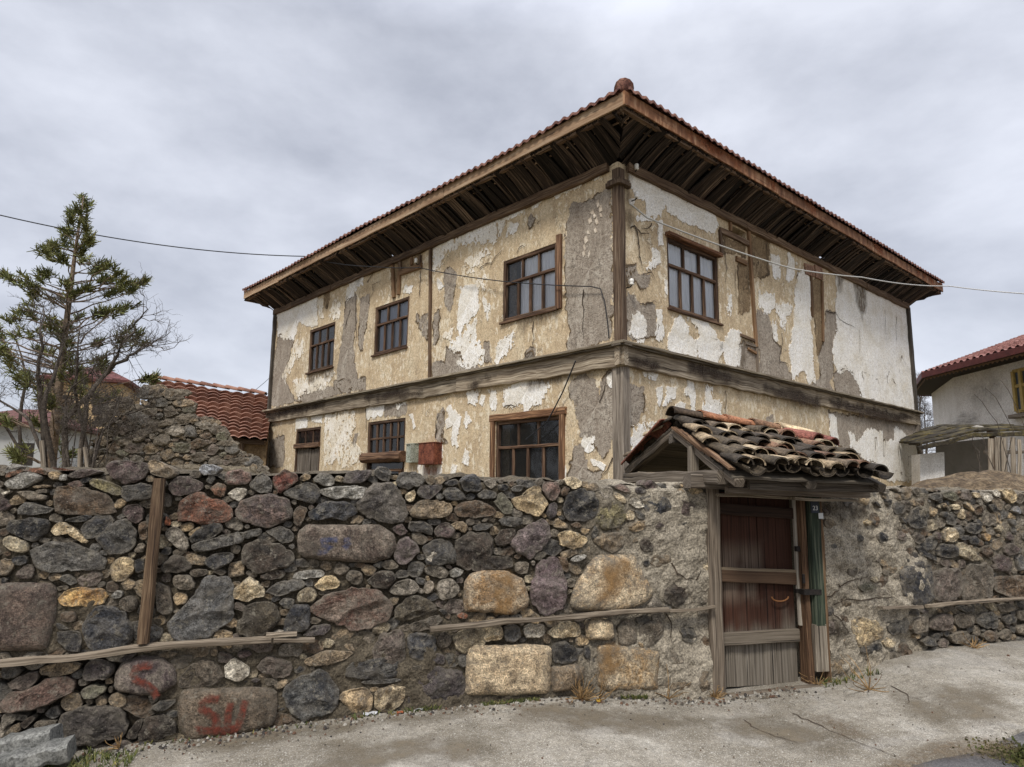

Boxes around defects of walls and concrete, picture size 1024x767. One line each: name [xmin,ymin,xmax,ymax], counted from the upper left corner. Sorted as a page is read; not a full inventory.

flaking render [271,277,370,408]
peeling [415,201,542,377]
peeling [554,173,914,410]
peeling [268,401,416,469]
peeling [417,380,551,476]
flaking render [565,369,613,480]
peeling [828,409,922,483]